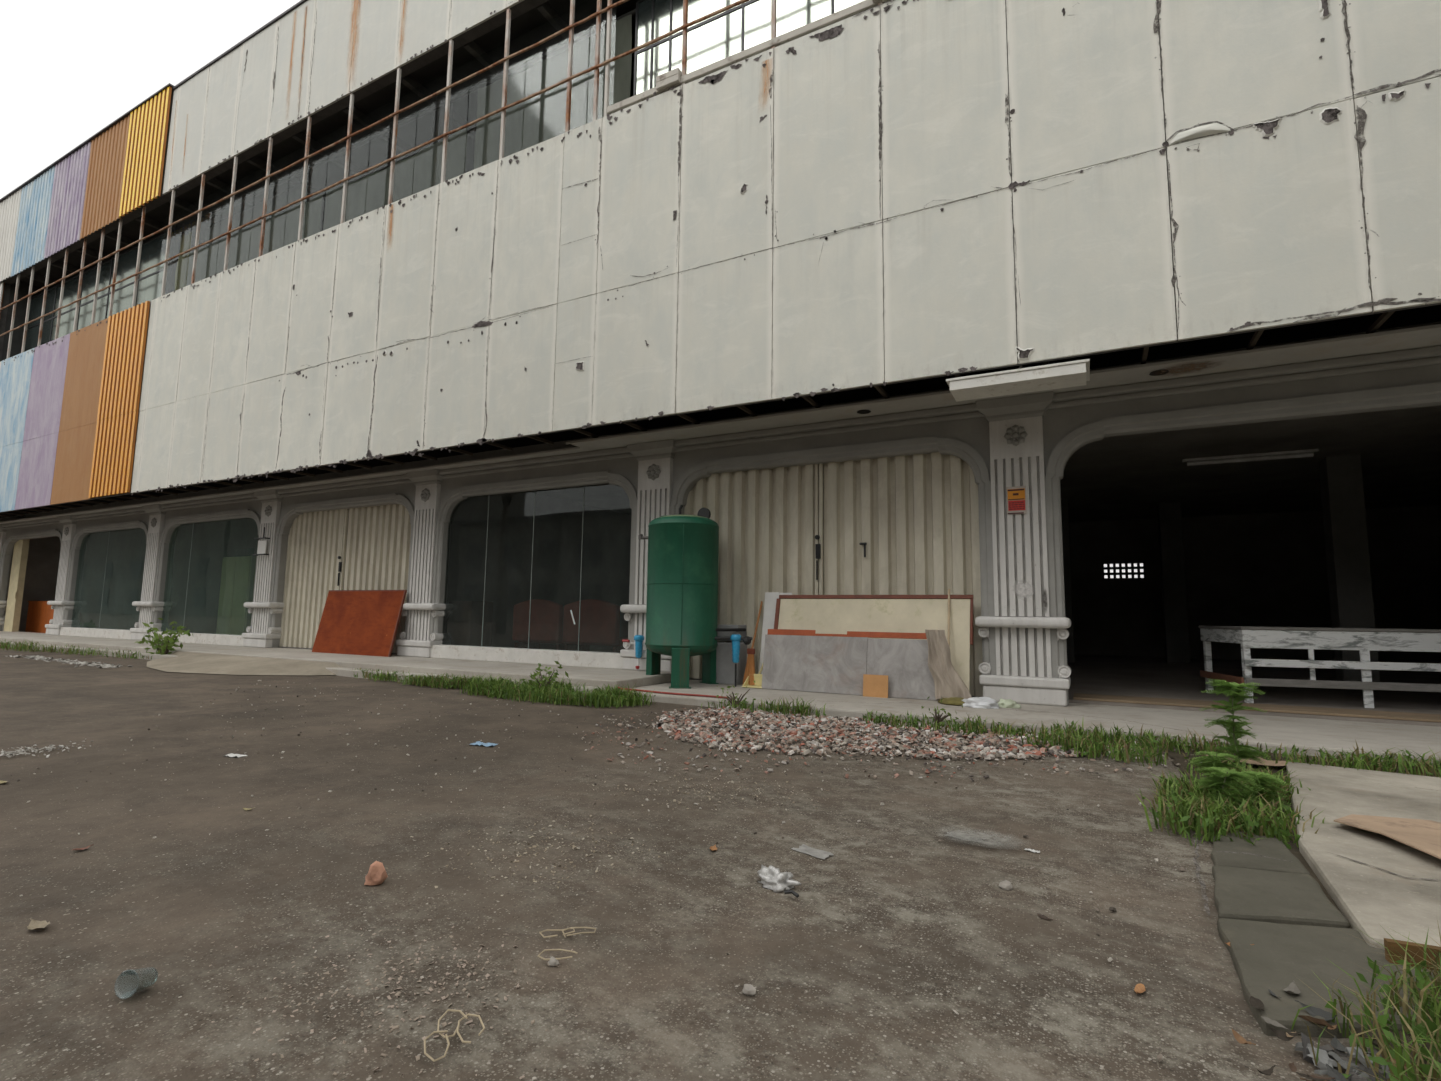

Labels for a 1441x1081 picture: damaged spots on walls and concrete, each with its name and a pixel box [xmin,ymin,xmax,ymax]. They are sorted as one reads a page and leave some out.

peeling [809,0,915,41]
spalling [1317,0,1331,20]
corrosion [290,7,307,116]
peeling [698,47,796,84]
peeling [607,85,681,125]